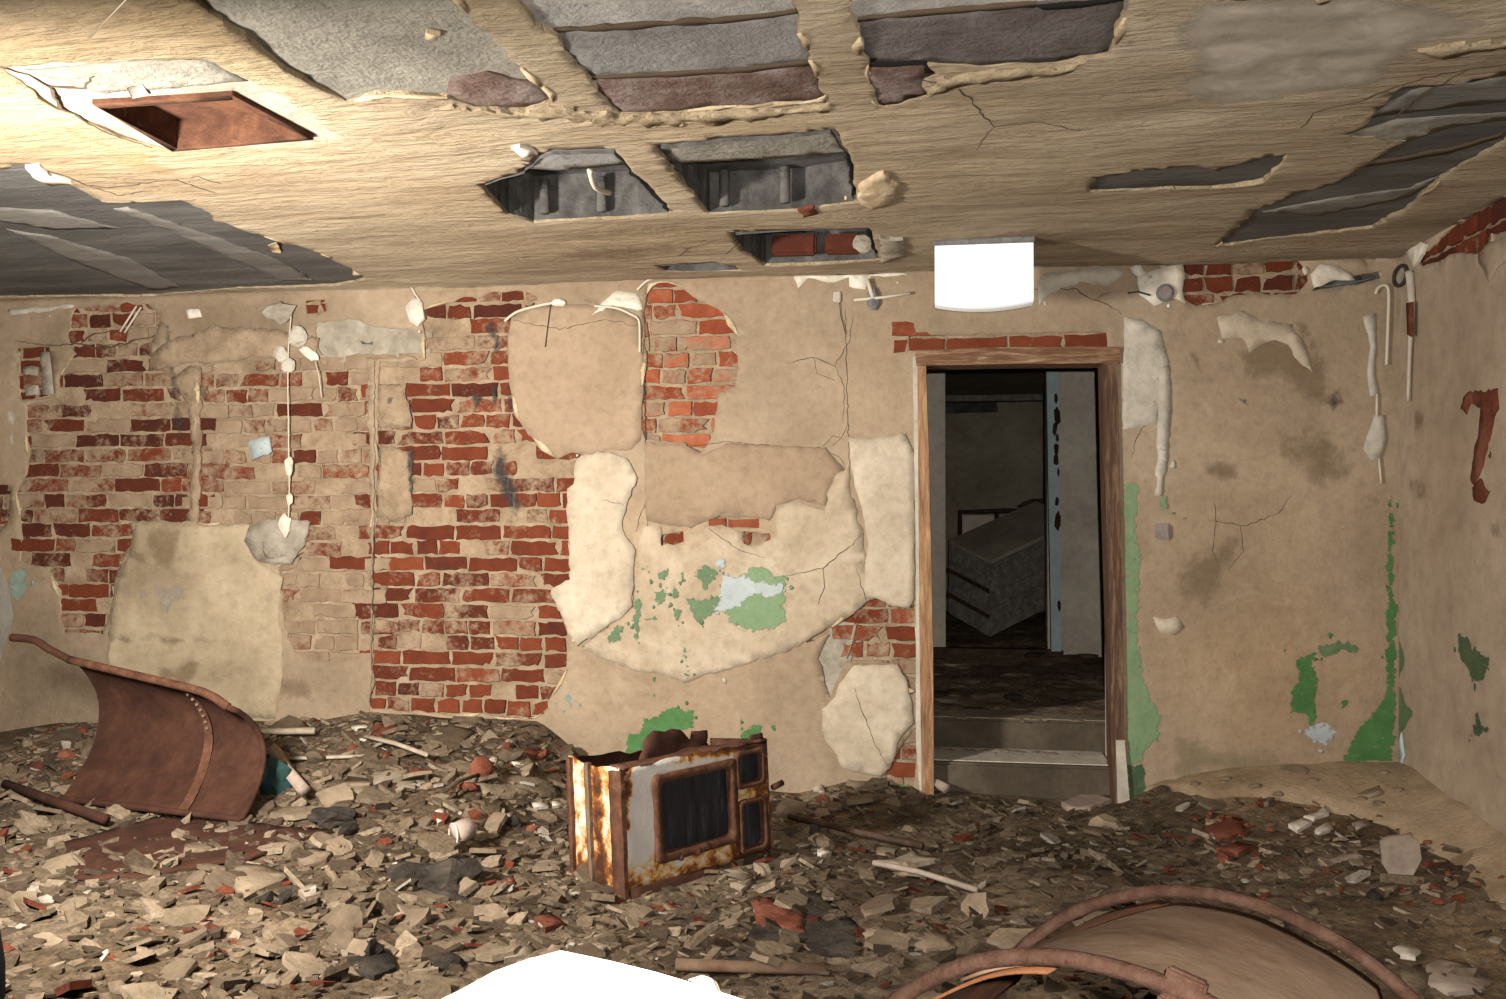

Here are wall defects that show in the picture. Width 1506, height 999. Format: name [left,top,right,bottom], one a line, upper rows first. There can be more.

spalling [5,59,342,149]
flaking render [354,67,830,129]
flaking render [852,37,887,108]
crack [920,78,1081,149]
flaking render [927,60,1087,98]
flaking render [25,163,71,186]
spalling [511,144,538,159]
spalling [1405,195,1506,283]
flaking render [0,281,917,805]
crack [1212,496,1291,568]
peeling [1284,483,1412,763]
peeling [1453,633,1489,692]